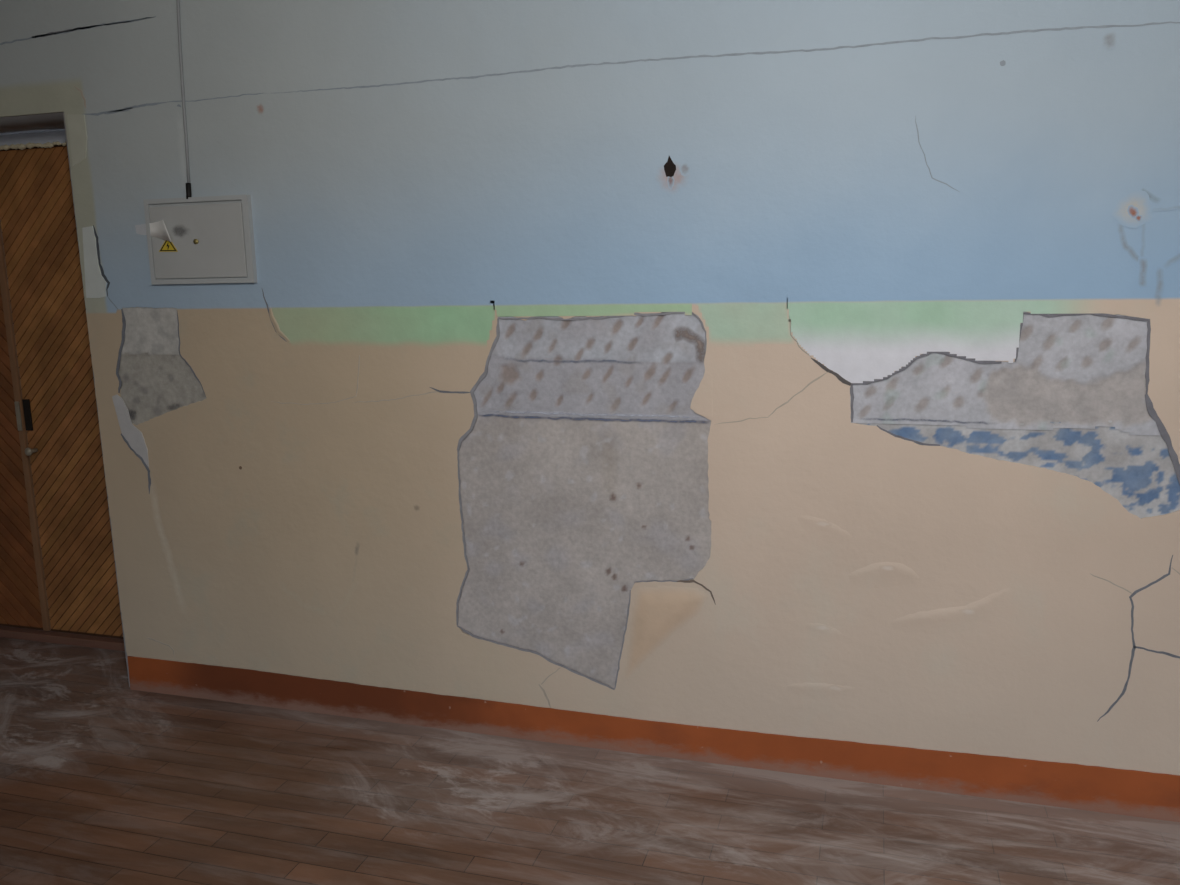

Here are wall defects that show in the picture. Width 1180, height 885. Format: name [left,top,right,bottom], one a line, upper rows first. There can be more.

peeling [67,114,87,166]
crack [84,21,1180,116]
crack [915,116,959,192]
spalling [82,225,206,617]
spalling [262,289,716,690]
spalling [787,295,1180,519]
crack [1091,555,1180,722]